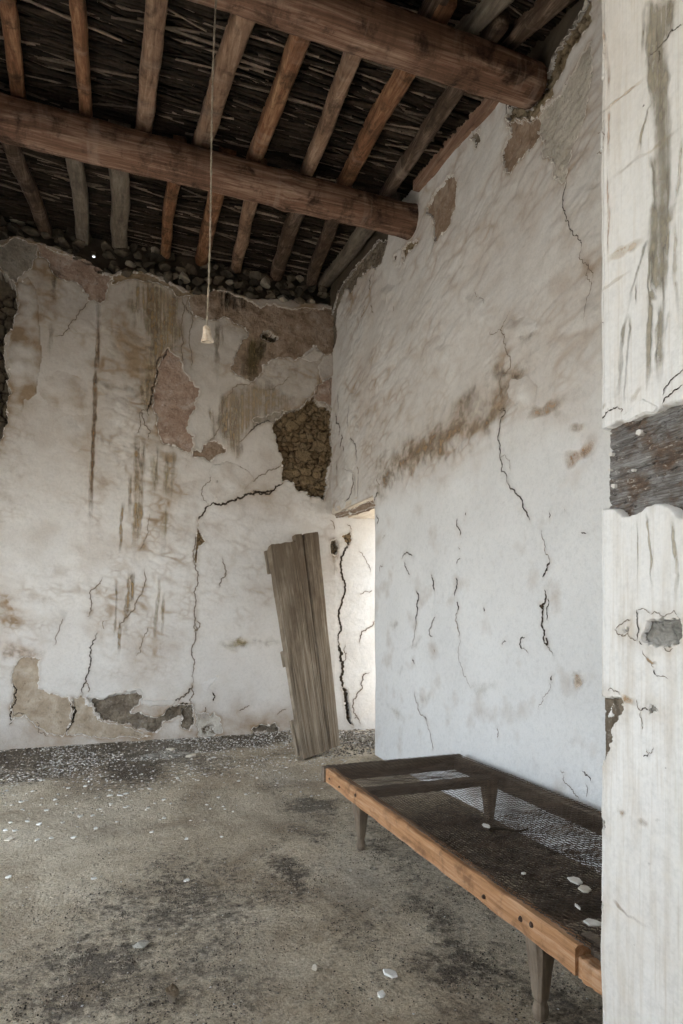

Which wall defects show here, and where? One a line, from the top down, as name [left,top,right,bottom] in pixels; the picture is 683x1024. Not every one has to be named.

leakage [634,2,681,369]
crack [9,516,150,736]
spalling [10,656,223,739]
leakage [116,579,134,612]
leakage [119,448,168,545]
spalling [0,237,418,518]
crack [169,377,289,722]
crack [316,375,467,724]
leakage [383,414,472,485]
crack [490,319,552,707]
spalling [603,698,624,763]
spalling [625,616,683,649]